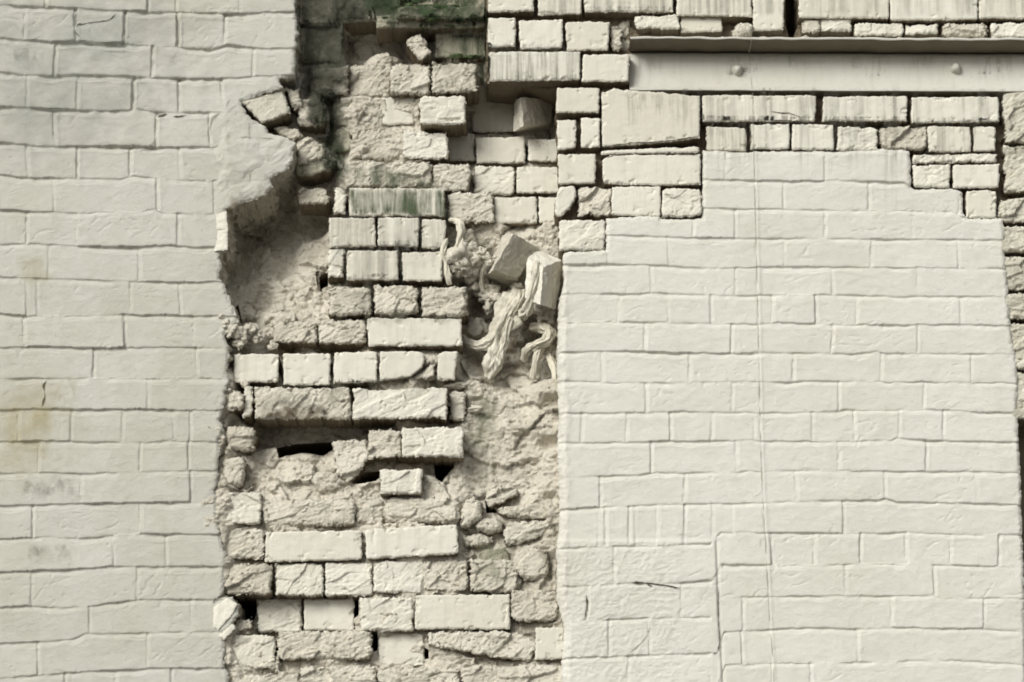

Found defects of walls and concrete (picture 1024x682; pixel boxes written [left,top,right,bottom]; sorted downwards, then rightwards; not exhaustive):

spalling [201,0,564,682]
crack [632,581,678,592]